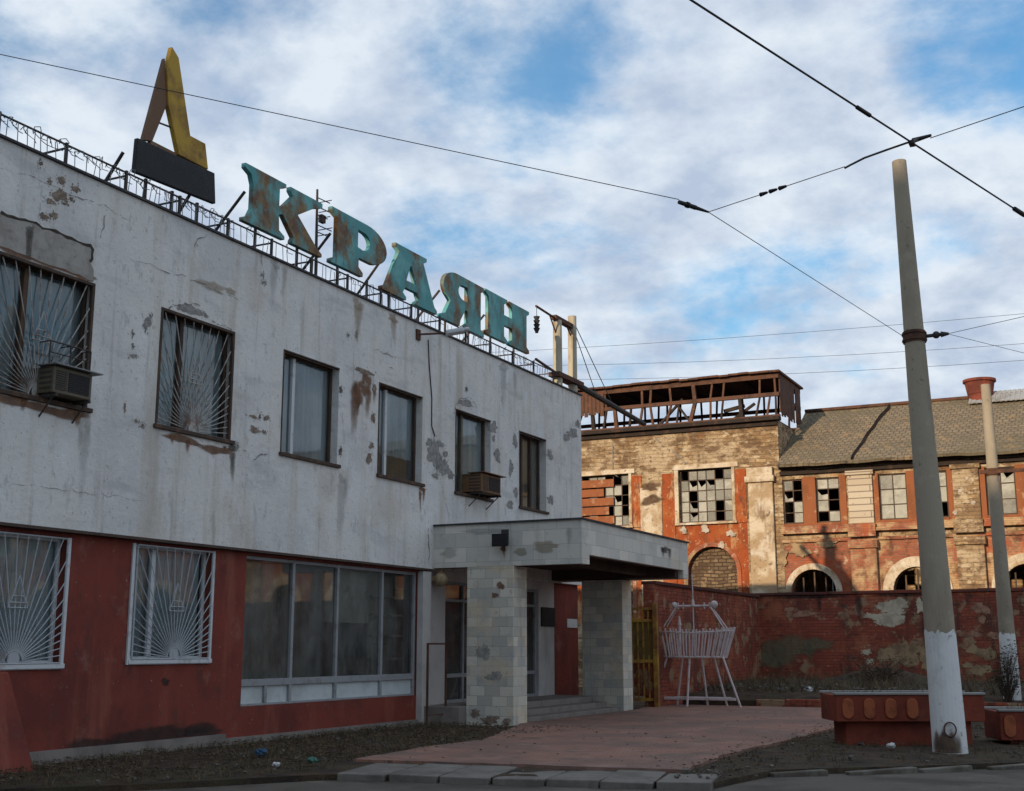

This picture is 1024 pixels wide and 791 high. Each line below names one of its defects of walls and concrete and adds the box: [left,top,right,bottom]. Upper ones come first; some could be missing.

spalling [0,175,94,281]
rust [352,374,376,418]
rust [163,433,231,454]
spalling [426,438,455,481]
peeling [864,597,923,627]
peeling [962,615,999,676]